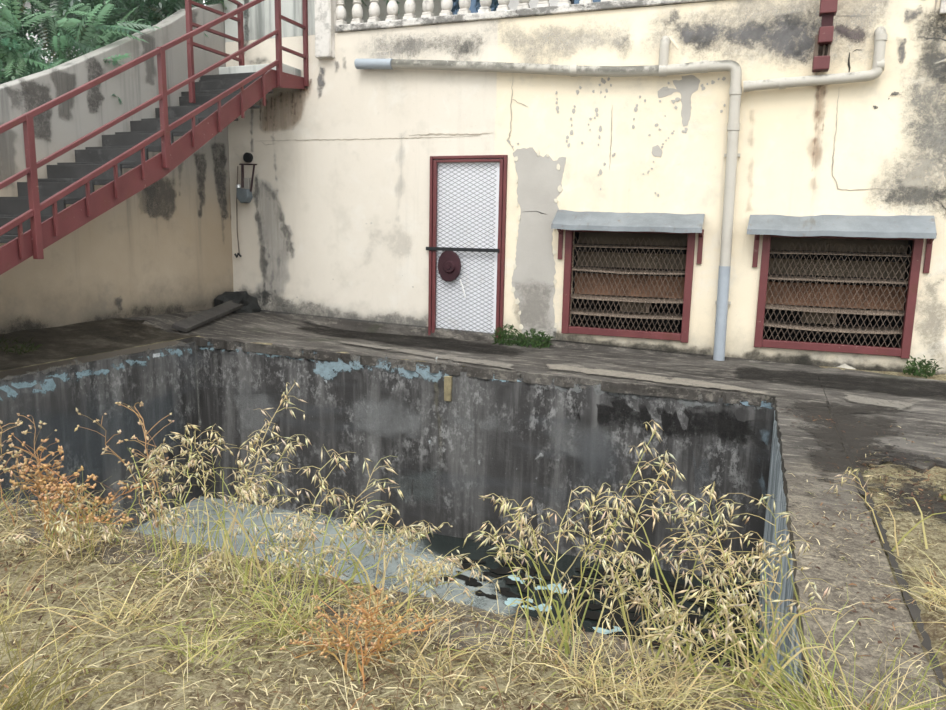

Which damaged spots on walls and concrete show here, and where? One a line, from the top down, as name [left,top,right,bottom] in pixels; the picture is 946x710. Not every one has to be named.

water stain [20,69,76,141]
water stain [87,58,104,112]
crack [260,83,528,150]
peeling [642,75,726,175]
crack [832,15,887,191]
water stain [879,9,946,208]
water stain [145,178,176,220]
water stain [194,144,228,219]
peeling [507,77,612,340]
water stain [244,177,523,356]
peeling [0,340,525,401]
water stain [597,400,768,443]